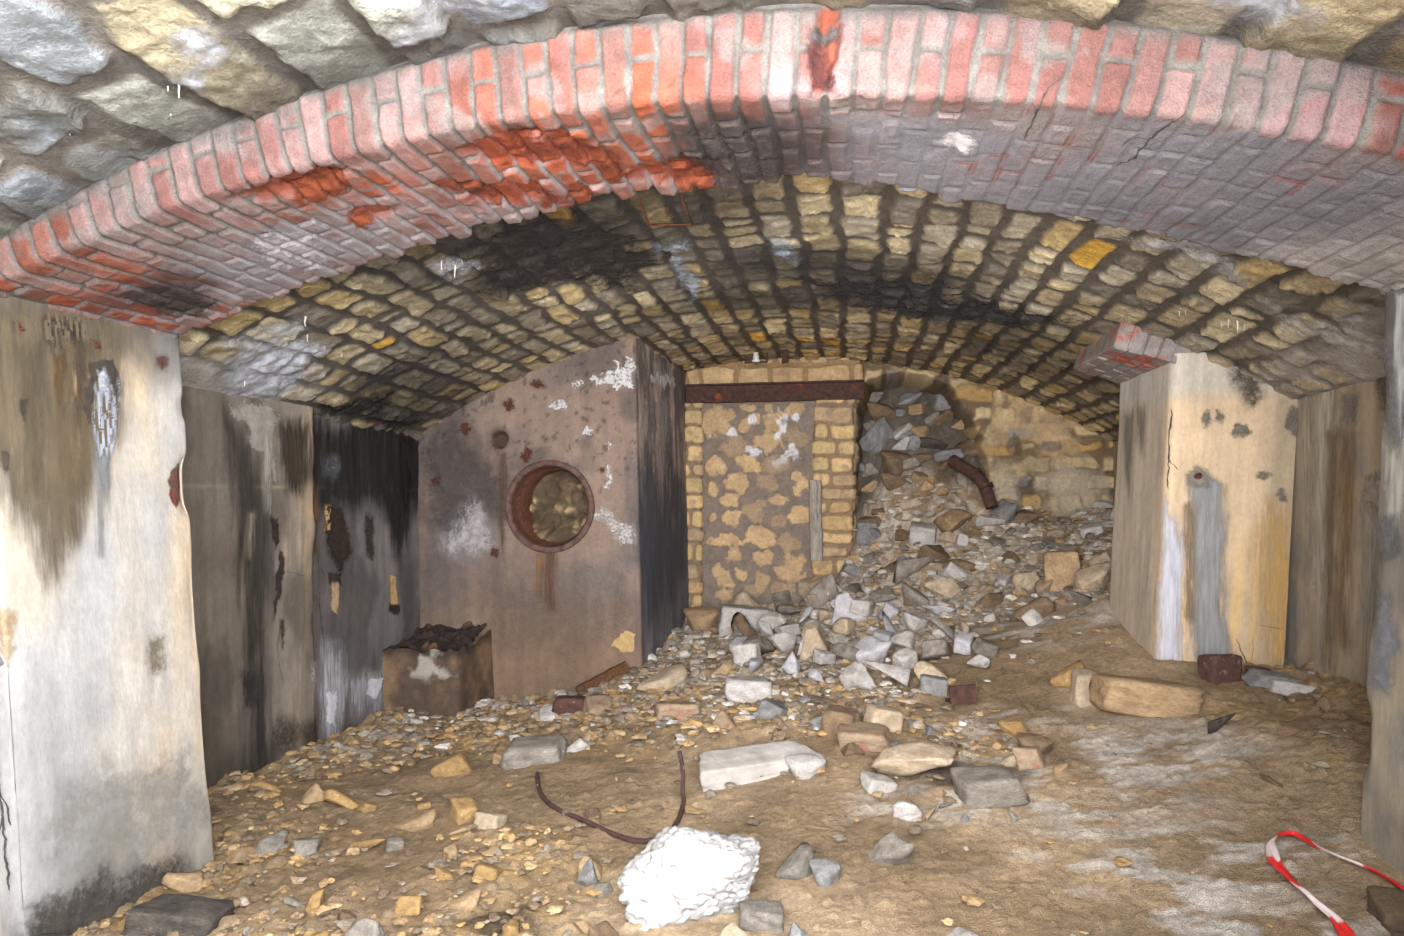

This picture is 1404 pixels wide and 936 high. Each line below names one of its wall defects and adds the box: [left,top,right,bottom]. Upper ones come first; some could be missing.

spalling [808,26,840,91]
spalling [432,177,502,206]
spalling [505,128,627,208]
spalling [670,157,716,192]
water stain [433,258,479,275]
water stain [1123,237,1246,286]
water stain [224,321,326,400]
water stain [0,301,124,577]
water stain [443,502,493,555]
water stain [224,414,384,772]
spalling [0,610,17,666]
crack [0,789,11,891]